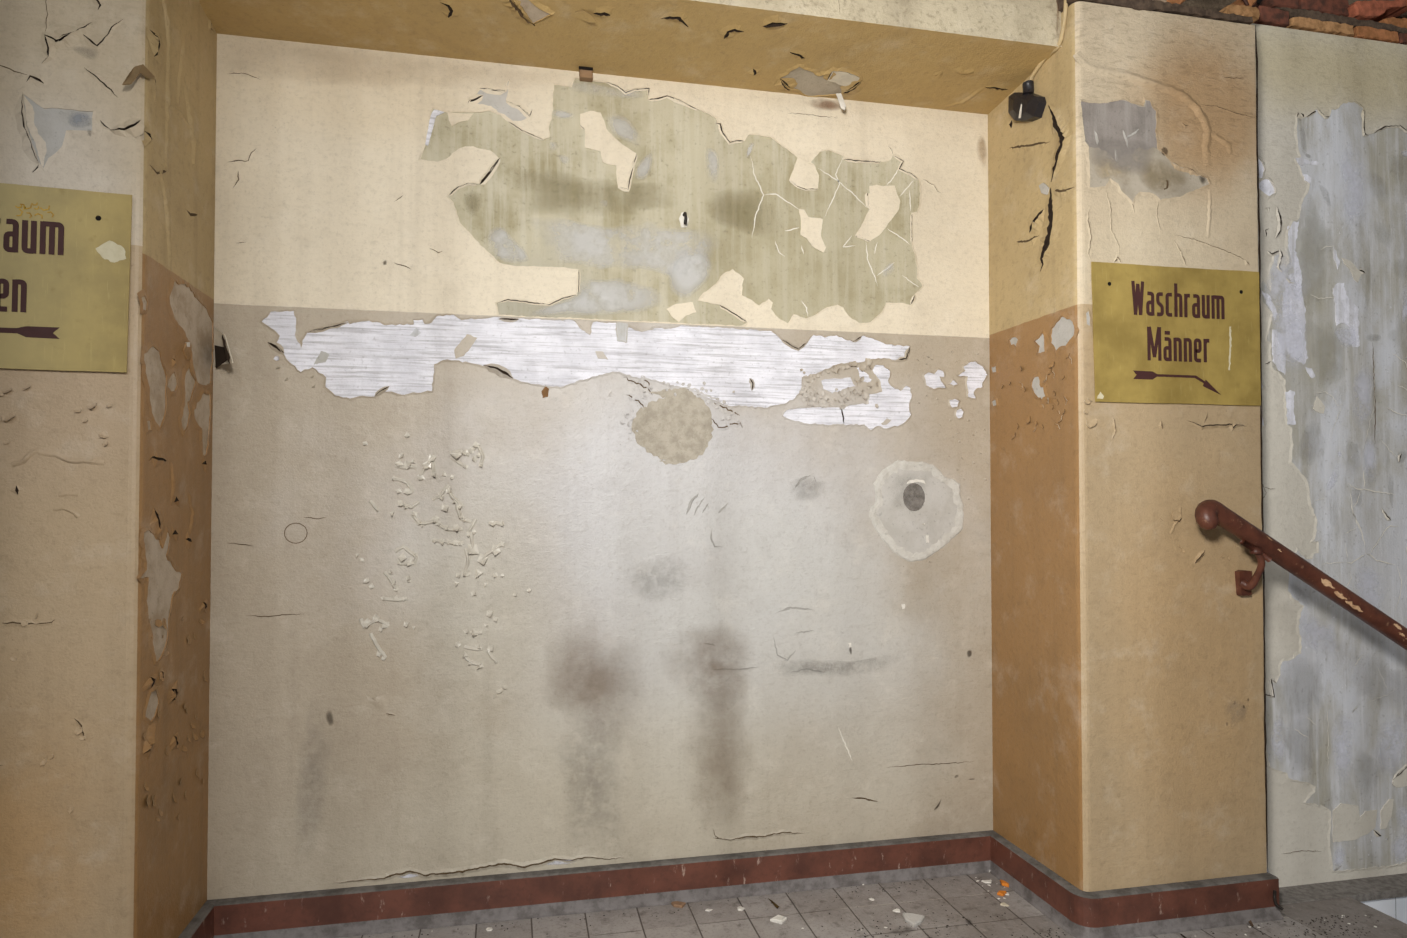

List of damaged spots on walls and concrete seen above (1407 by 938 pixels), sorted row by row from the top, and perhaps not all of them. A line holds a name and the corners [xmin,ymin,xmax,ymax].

crack [0,63,44,86]
peeling [774,64,865,110]
peeling [1078,96,1212,205]
peeling [259,76,999,465]
crack [985,24,1276,532]
peeling [1007,307,1093,403]
flaking render [869,460,964,562]
peeling [1258,99,1407,874]
peeling [137,526,183,666]
peeling [142,685,160,759]
crack [1263,569,1340,871]